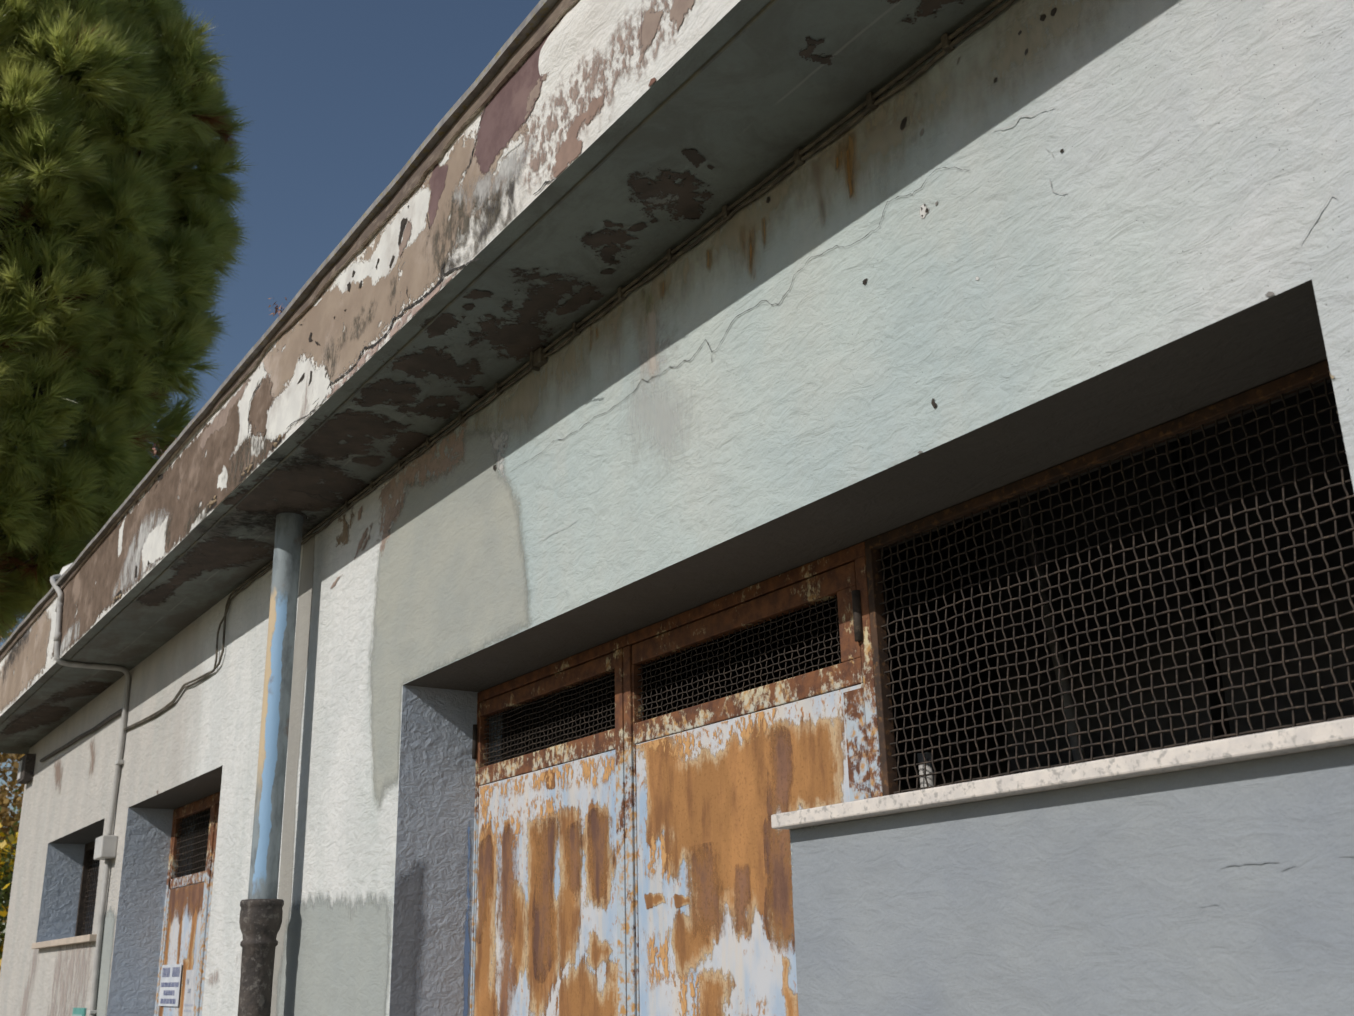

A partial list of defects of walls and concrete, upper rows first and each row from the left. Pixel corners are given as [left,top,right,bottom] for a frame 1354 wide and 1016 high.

peeling [799,36,835,65]
peeling [0,0,715,735]
crack [511,167,962,472]
rust [159,882,204,1016]
rust [474,755,618,1016]
rust [636,706,845,1016]